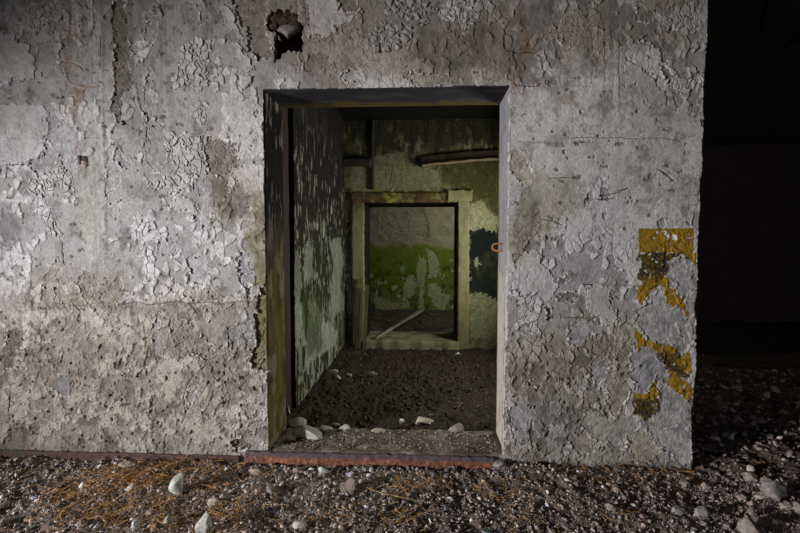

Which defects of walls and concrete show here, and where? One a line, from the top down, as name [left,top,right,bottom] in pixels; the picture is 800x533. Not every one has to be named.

peeling [0,28,42,82]
spalling [217,0,361,73]
peeling [0,102,80,200]
peeling [104,142,129,221]
spalling [110,0,242,231]
peeling [41,212,63,239]
peeling [41,256,73,313]
spalling [75,270,124,329]
peeling [156,237,229,303]
peeling [510,250,695,466]